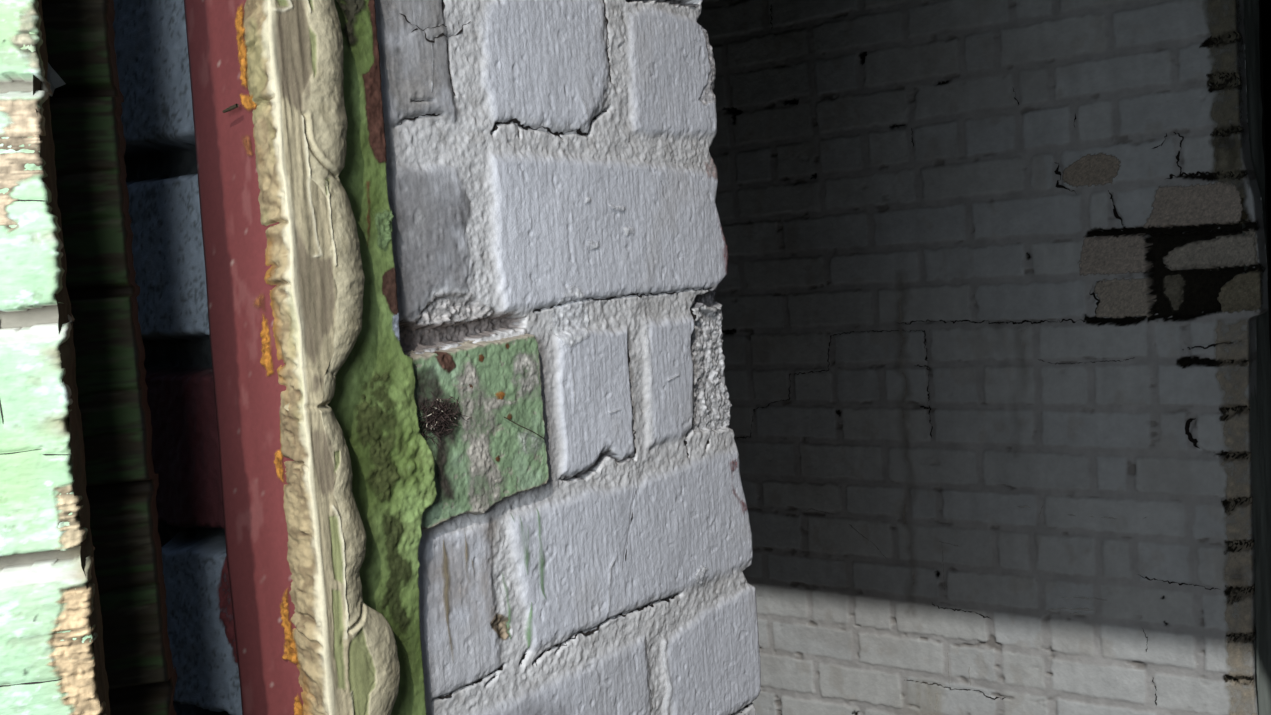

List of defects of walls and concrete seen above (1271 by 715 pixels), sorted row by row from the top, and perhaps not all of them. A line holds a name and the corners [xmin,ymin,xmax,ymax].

peeling [0,63,66,231]
peeling [1062,153,1121,187]
spalling [1079,182,1265,326]
peeling [54,485,87,549]
peeling [48,583,105,715]